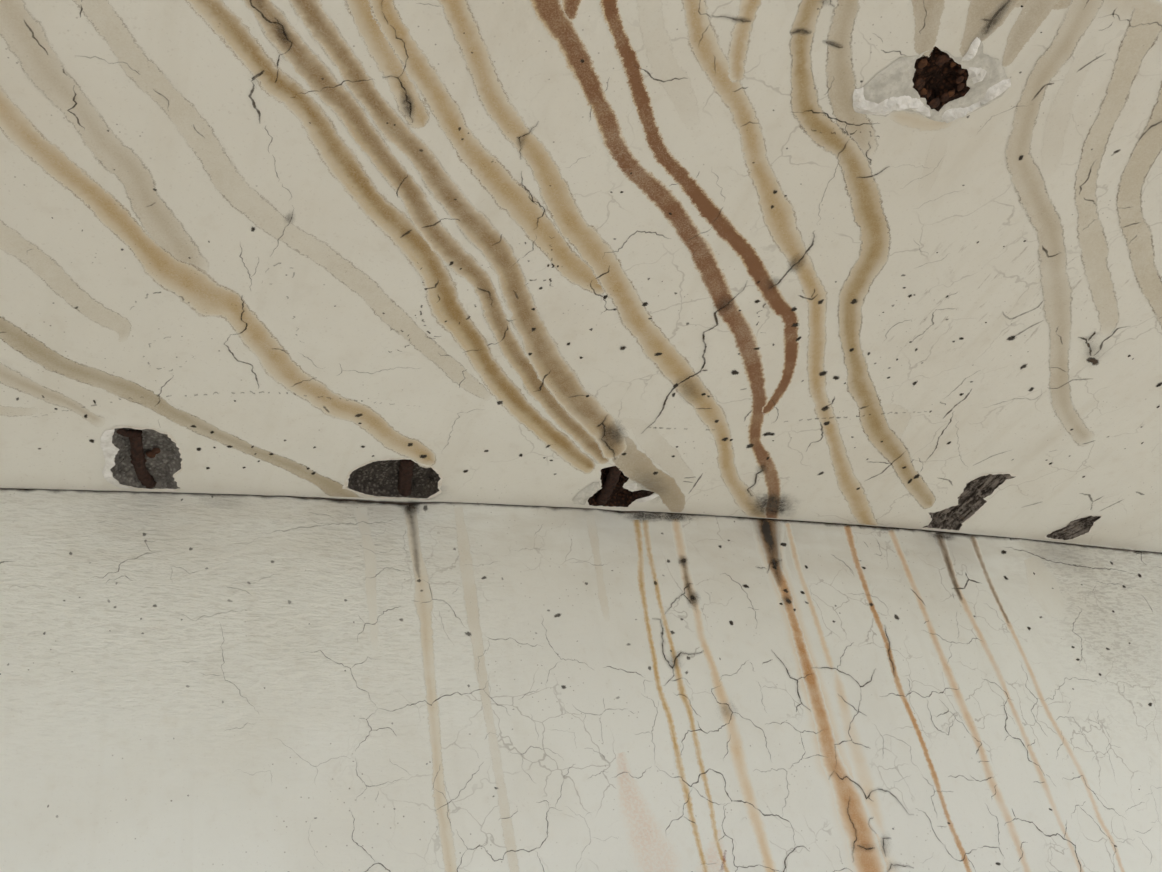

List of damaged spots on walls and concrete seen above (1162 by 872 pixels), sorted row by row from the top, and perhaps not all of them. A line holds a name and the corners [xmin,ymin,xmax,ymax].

water stain [0,0,437,468]
crack [249,0,412,145]
water stain [636,0,936,525]
spalling [100,426,183,491]
spalling [342,458,443,500]
water stain [72,0,779,872]
crack [0,470,1162,569]
rust [529,0,902,872]
spalling [922,472,1019,532]
crack [608,586,1085,872]
rust [843,525,973,872]
rust [934,533,1125,872]